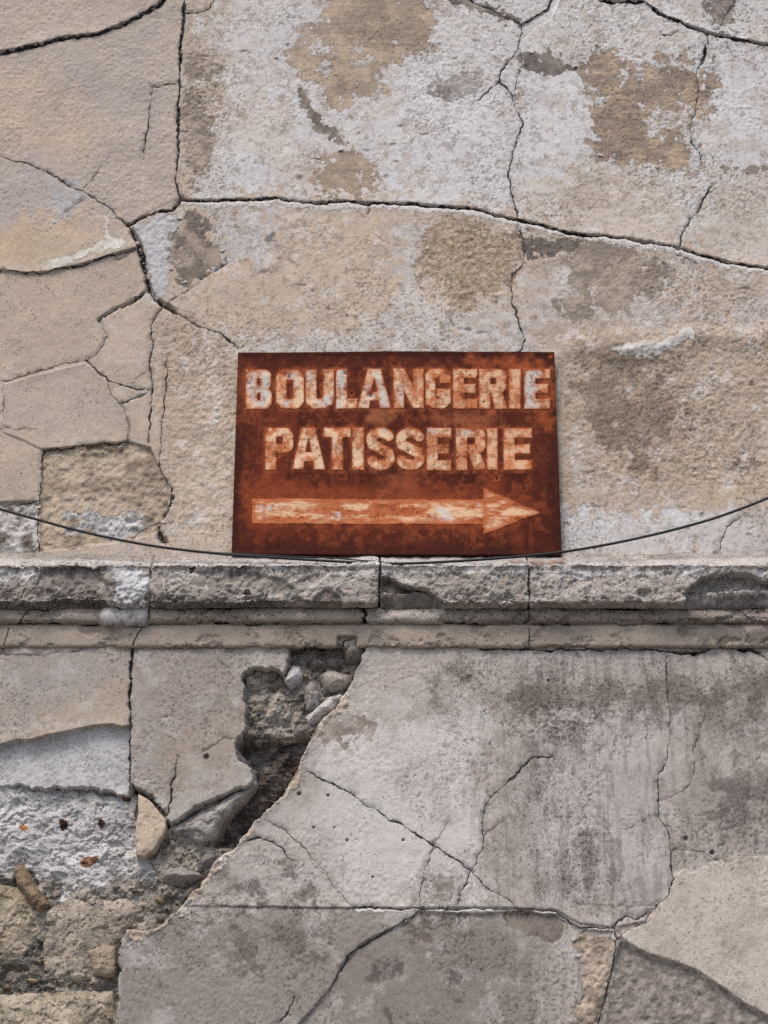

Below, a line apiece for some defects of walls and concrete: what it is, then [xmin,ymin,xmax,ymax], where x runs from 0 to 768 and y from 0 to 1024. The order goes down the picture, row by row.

crack [0,0,768,552]
spalling [0,644,377,1024]
crack [183,565,768,1024]